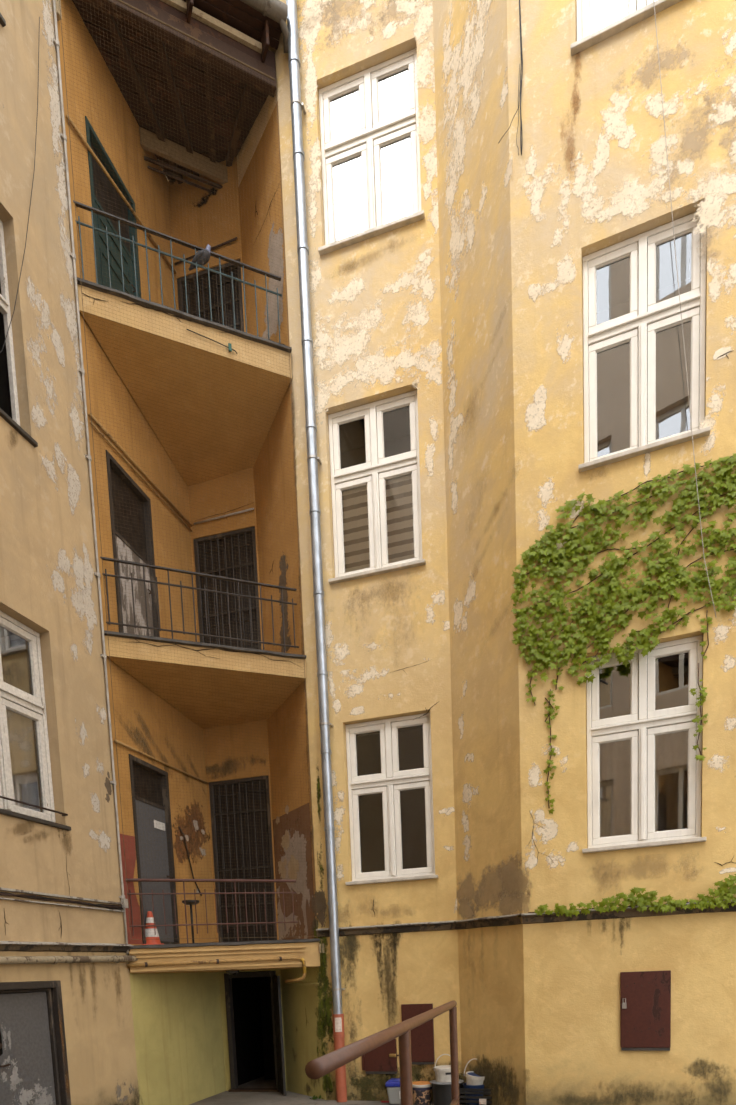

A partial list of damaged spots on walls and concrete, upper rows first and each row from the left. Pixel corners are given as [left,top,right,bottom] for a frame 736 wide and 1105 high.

peeling [523,67,736,302]
peeling [298,0,491,514]
peeling [525,385,547,432]
peeling [700,377,725,450]
peeling [538,478,557,531]
peeling [272,803,327,940]
peeling [498,809,579,897]
leakage [374,933,400,1016]
peeling [0,1022,53,1105]
leakage [350,1074,375,1101]
leakage [386,1064,429,1081]
leakage [459,1060,519,1105]